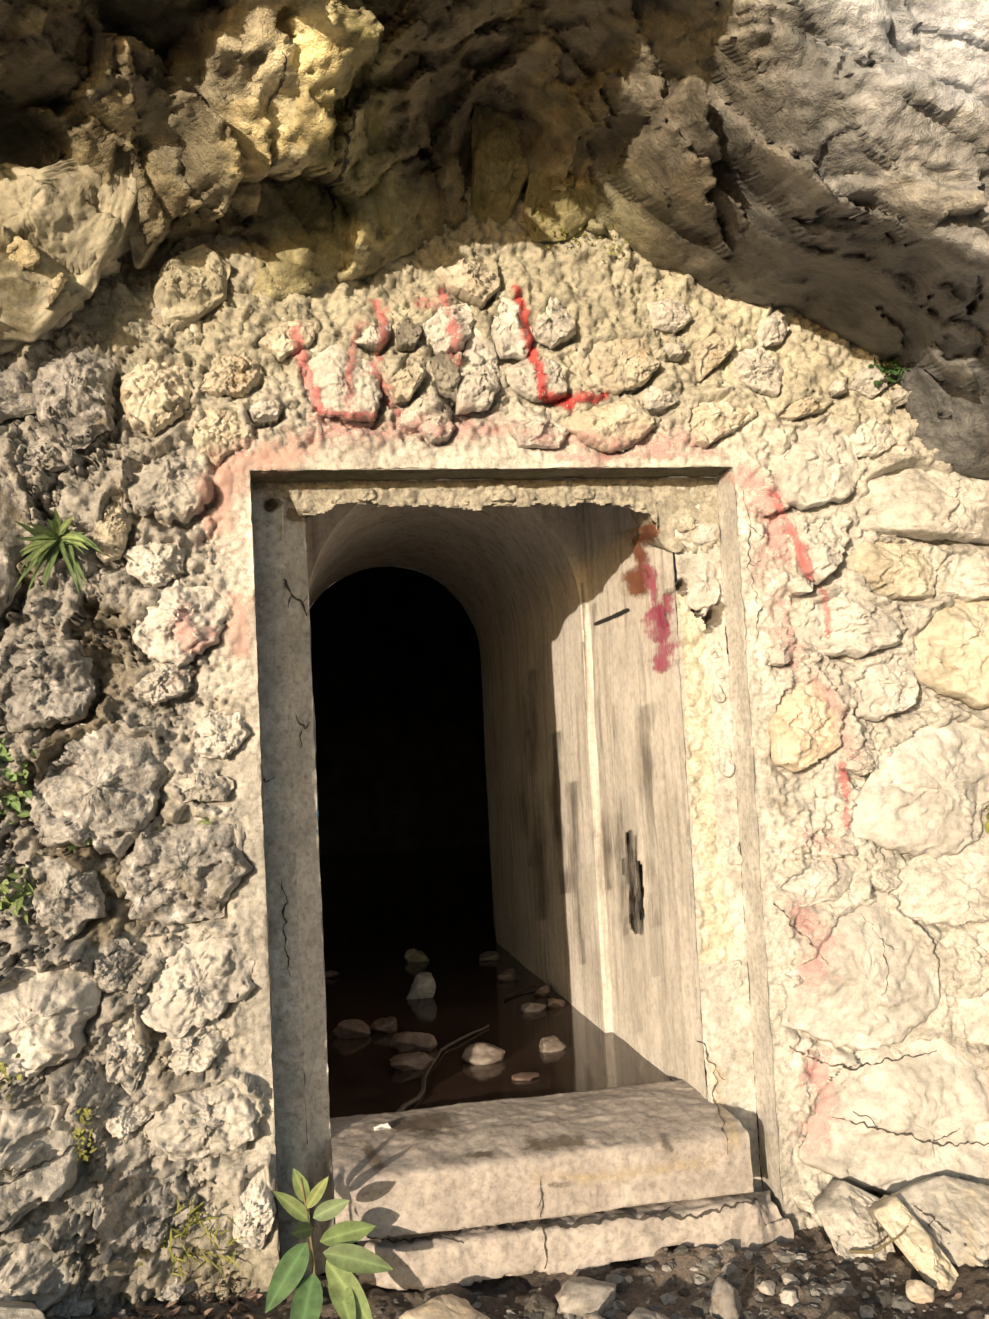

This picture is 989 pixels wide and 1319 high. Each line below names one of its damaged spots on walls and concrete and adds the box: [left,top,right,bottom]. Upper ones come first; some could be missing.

crack [267,51,287,114]
crack [325,86,356,238]
crack [284,579,307,616]
crack [789,1046,937,1073]
crack [827,1111,989,1147]
crack [367,1177,758,1269]
crack [914,1205,951,1234]
crack [585,1252,747,1278]